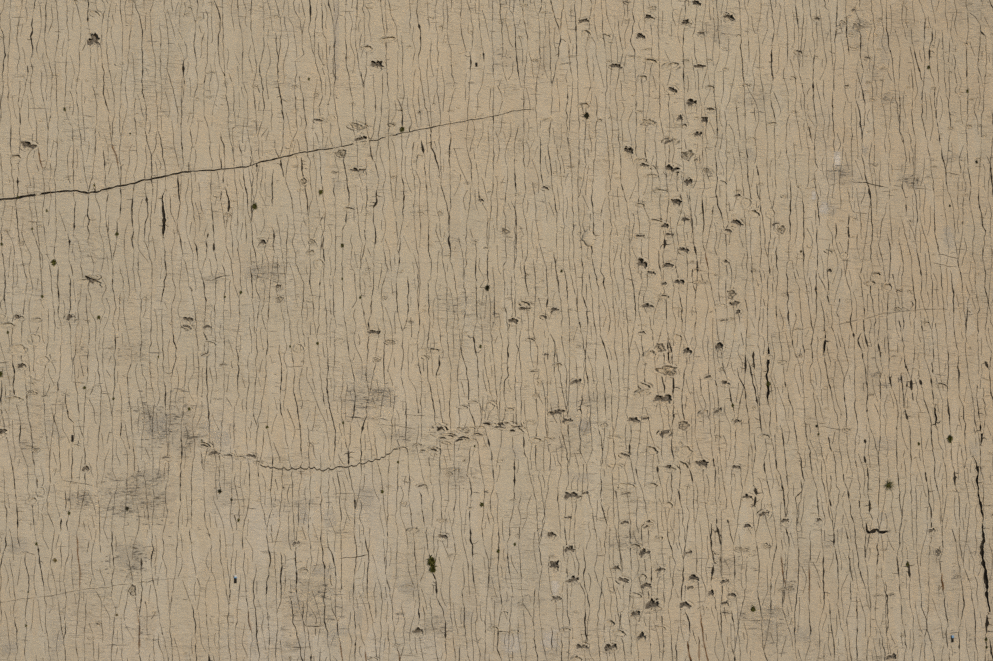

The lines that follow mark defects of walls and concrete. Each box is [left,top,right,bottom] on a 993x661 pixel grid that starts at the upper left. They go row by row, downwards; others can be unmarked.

crack [427,0,495,48]
spalling [679,0,706,37]
peeling [607,56,730,84]
spalling [625,341,694,426]
crack [395,454,414,543]
crack [595,415,620,492]
spalling [607,406,743,473]
crack [687,469,709,507]
crack [374,542,398,610]
crack [548,553,573,661]
spalling [545,530,582,603]
spalling [560,517,738,661]